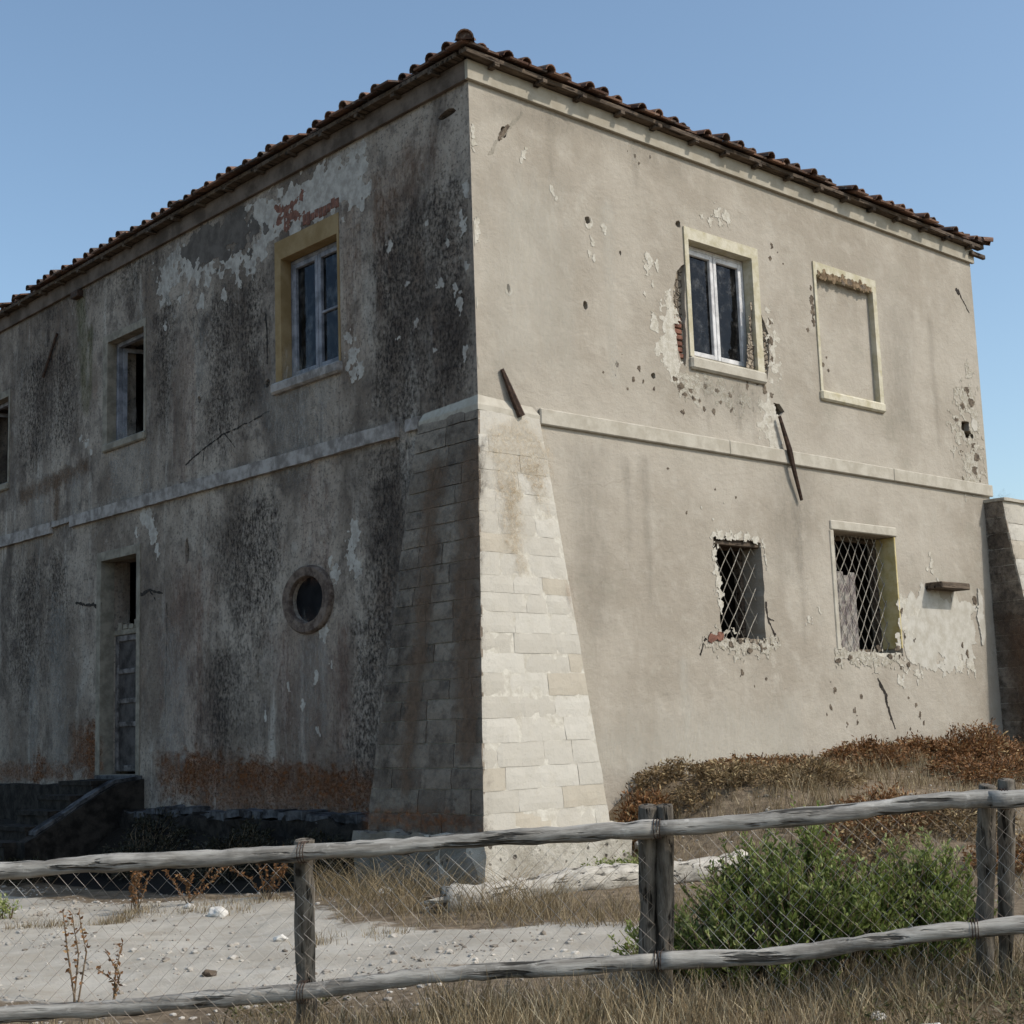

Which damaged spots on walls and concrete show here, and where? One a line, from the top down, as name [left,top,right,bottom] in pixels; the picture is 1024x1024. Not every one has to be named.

leakage [180,206,269,271]
peeling [151,139,372,331]
crack [185,411,270,466]
spalling [643,251,783,449]
spalling [946,358,987,501]
leakage [355,442,486,802]
spalling [699,518,781,677]
crack [877,678,896,729]
peeling [834,551,977,730]